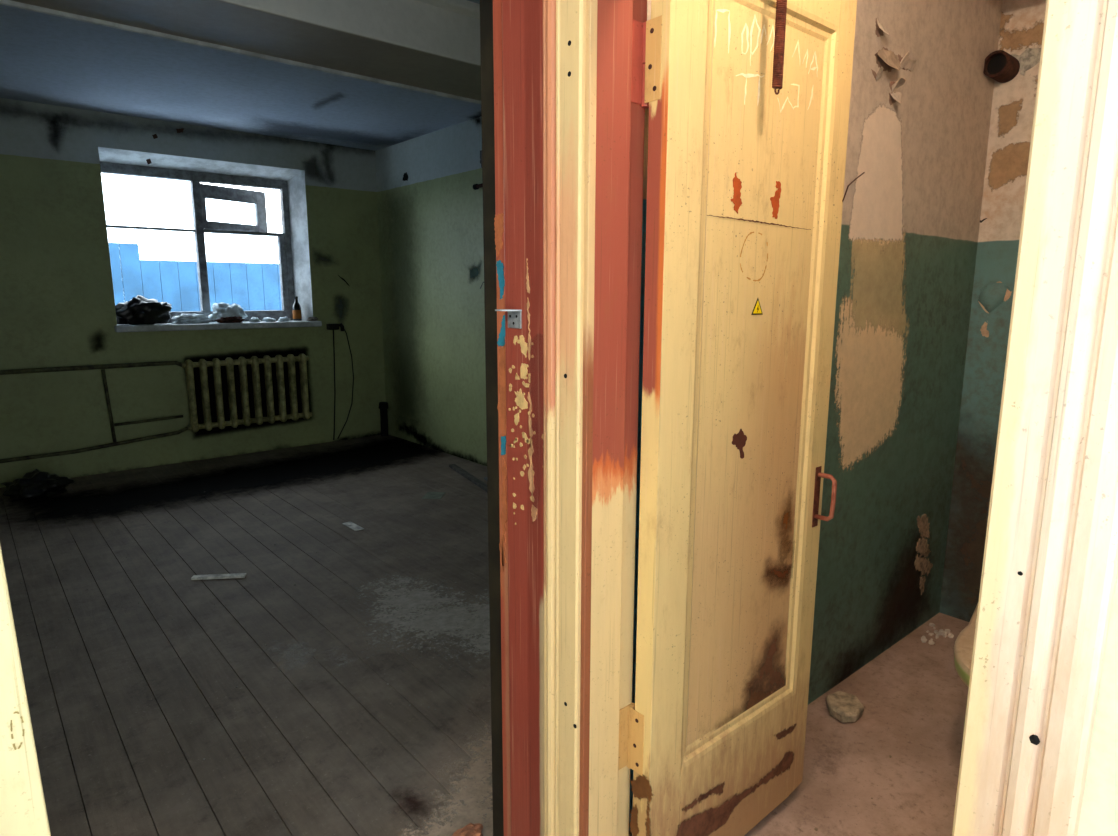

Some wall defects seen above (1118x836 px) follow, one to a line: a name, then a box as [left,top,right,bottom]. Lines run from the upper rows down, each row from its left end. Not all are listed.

peeling [871,18,917,105]
flaking render [1010,48,1041,76]
peeling [494,213,505,300]
peeling [497,259,538,571]
flaking render [915,514,933,595]
damp [942,434,994,622]
damp [835,532,927,685]